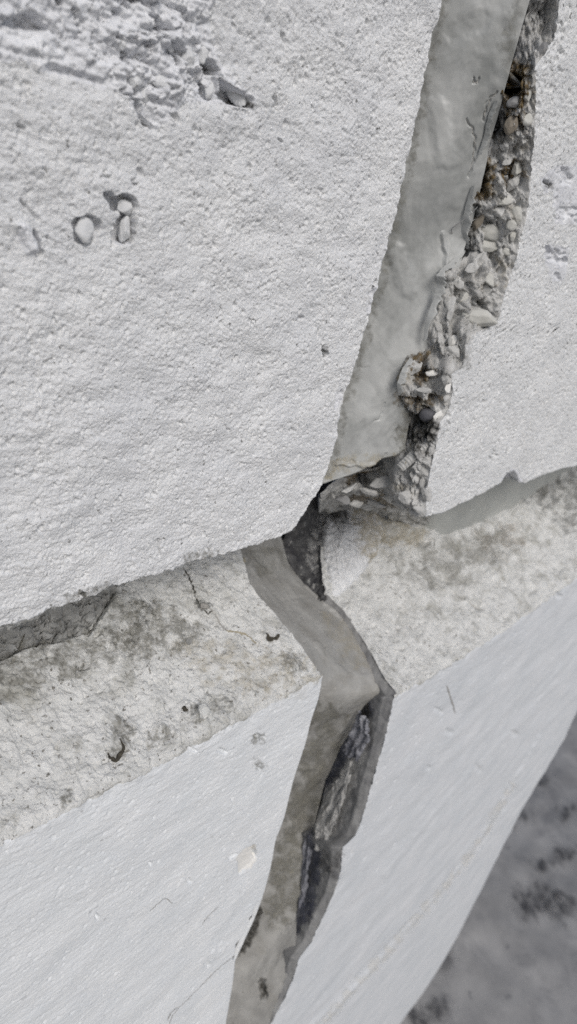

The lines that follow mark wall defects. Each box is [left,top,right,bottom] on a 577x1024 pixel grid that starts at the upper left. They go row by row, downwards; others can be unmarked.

spalling [71,191,137,246]
spalling [283,0,577,601]
crack [7,591,127,659]